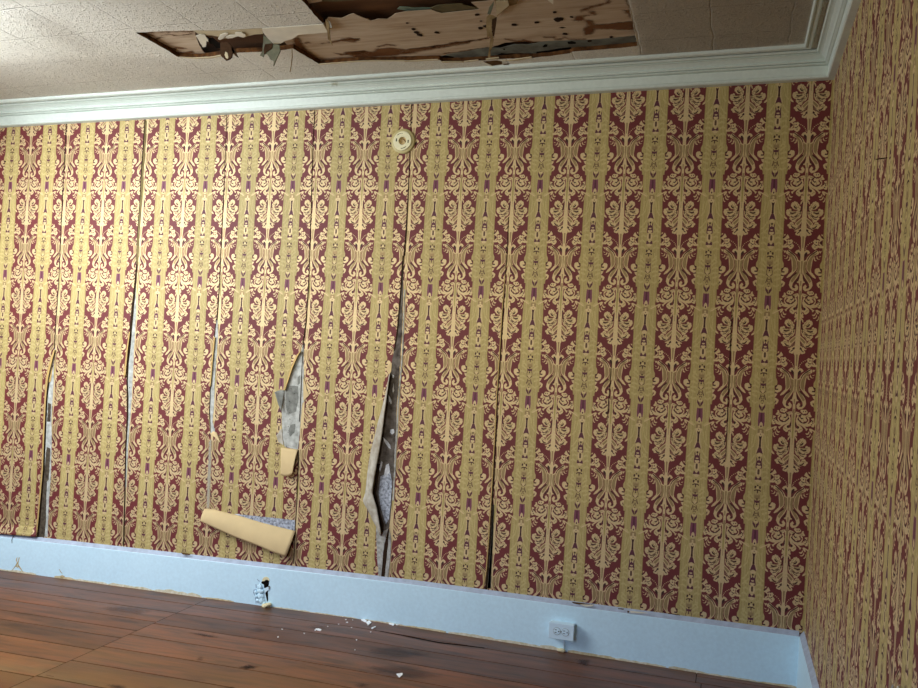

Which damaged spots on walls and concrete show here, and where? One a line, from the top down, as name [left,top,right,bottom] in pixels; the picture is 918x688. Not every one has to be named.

peeling [200,218,311,564]
peeling [363,153,410,577]
peeling [54,569,234,602]
peeling [253,577,796,688]